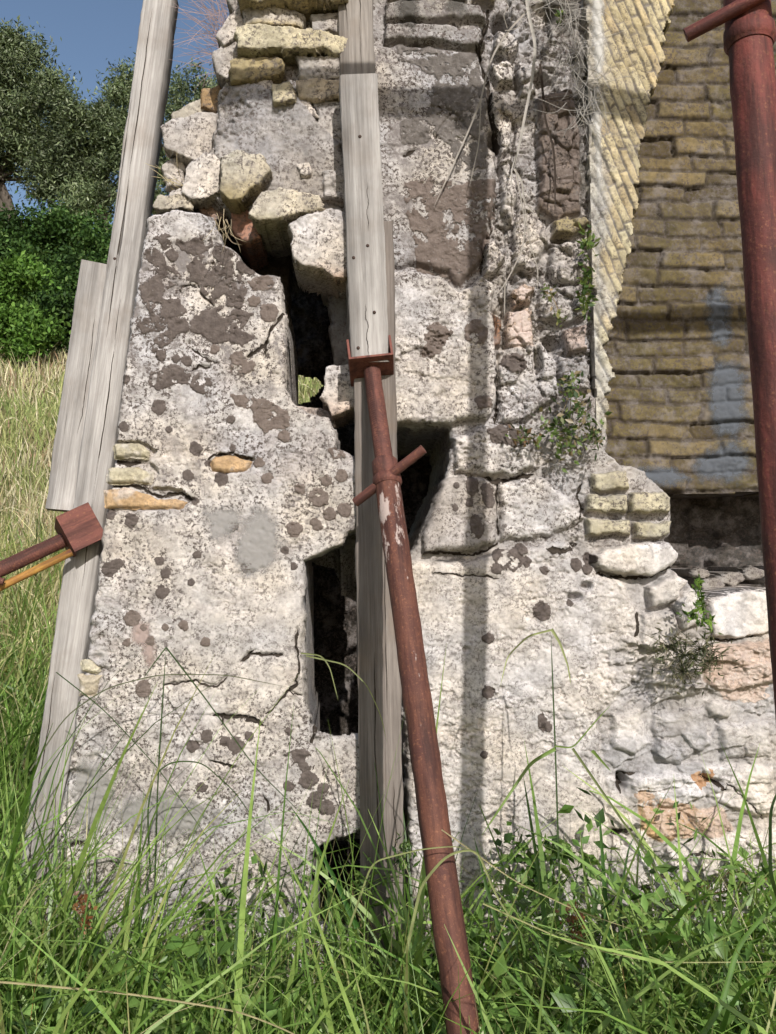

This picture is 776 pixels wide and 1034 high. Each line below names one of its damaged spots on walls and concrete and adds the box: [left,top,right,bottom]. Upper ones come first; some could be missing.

crack [475,9,500,155]
crack [247,313,285,358]
crack [164,630,300,726]